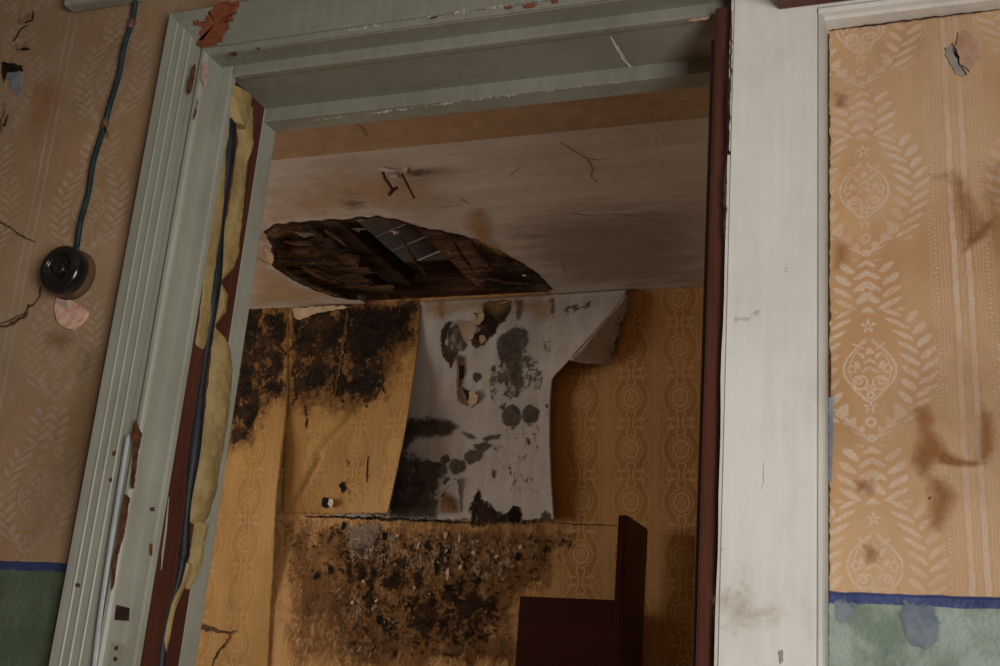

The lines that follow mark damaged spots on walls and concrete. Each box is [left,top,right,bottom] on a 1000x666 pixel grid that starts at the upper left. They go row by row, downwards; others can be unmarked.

peeling [194,0,240,48]
spalling [0,8,34,136]
crack [0,221,36,243]
crack [0,287,41,327]
water stain [229,229,449,449]
spalling [459,299,512,348]
water stain [276,211,590,666]
water stain [917,411,972,469]
peeling [92,419,142,666]
crack [201,624,237,665]